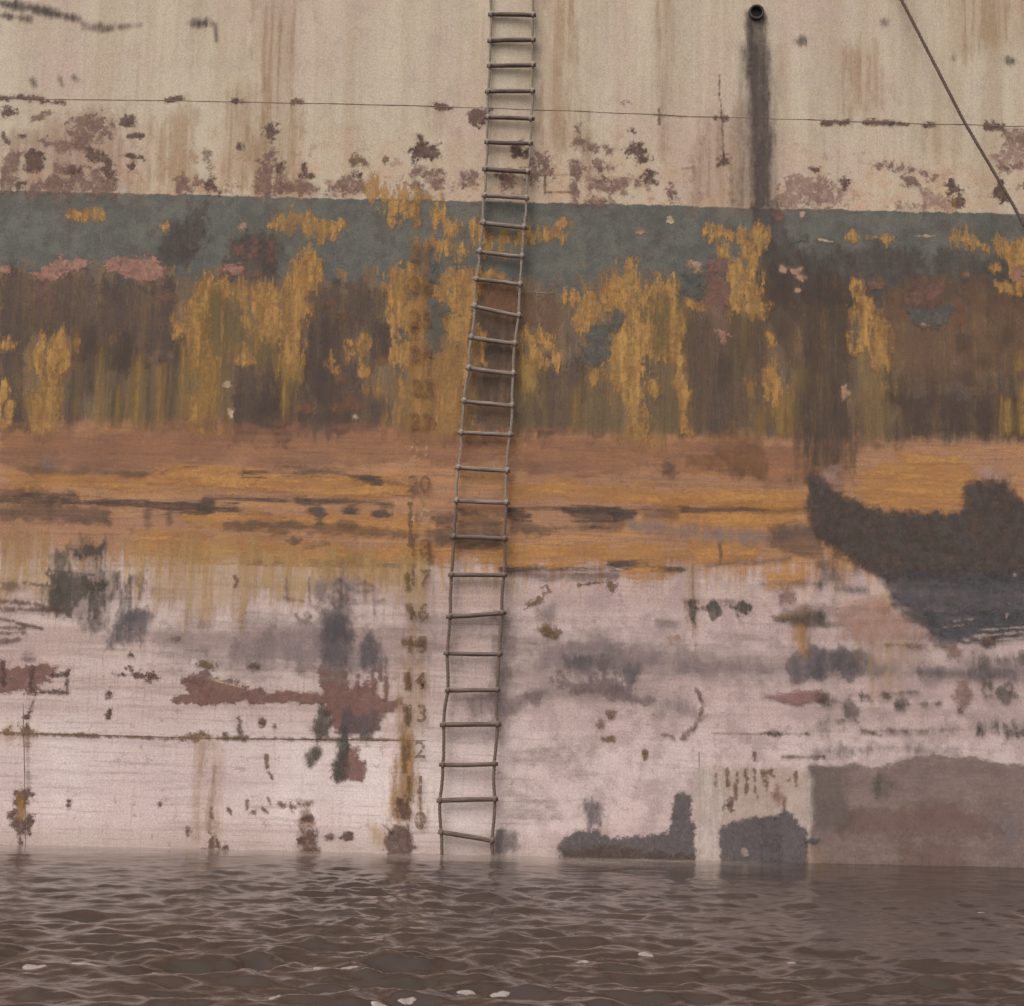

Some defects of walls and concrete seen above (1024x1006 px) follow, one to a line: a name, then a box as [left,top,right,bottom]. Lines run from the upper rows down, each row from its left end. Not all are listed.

leakage [747,11,786,254]
rust [0,465,821,640]
leakage [806,476,1024,678]
rust [7,789,35,845]
rust [373,704,423,854]
rust [596,710,616,742]